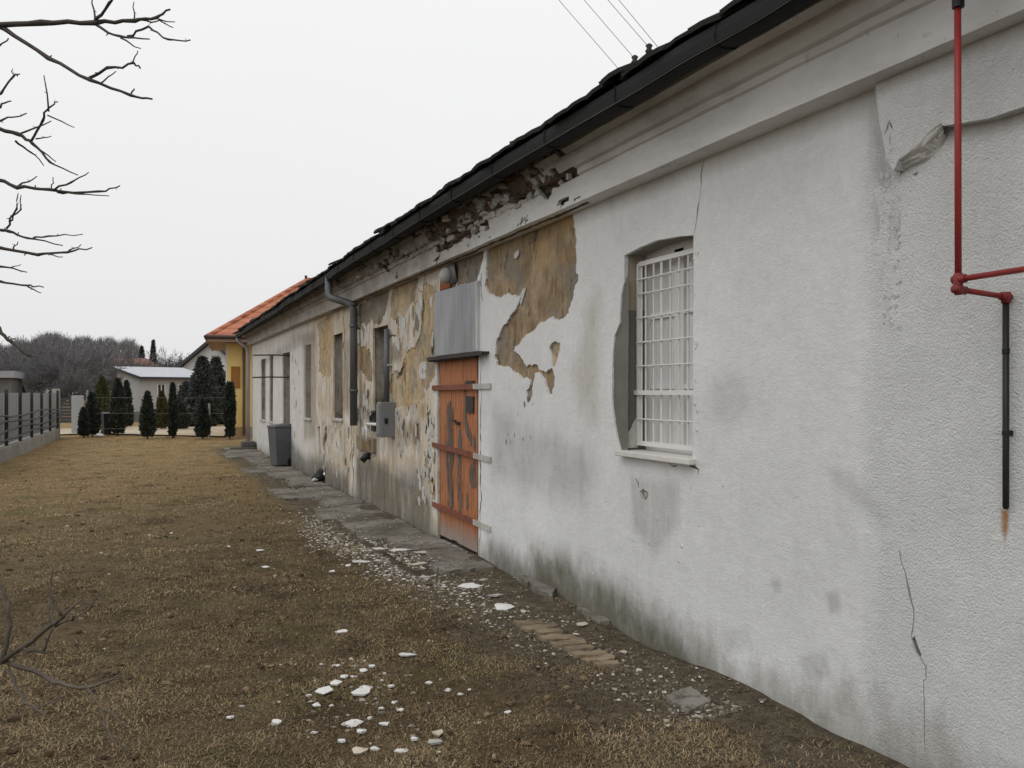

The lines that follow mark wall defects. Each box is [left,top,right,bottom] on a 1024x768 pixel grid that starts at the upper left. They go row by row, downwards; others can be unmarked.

crack [694,161,704,232]
spalling [318,214,578,513]
damp [538,559,687,662]
crack [899,550,927,746]